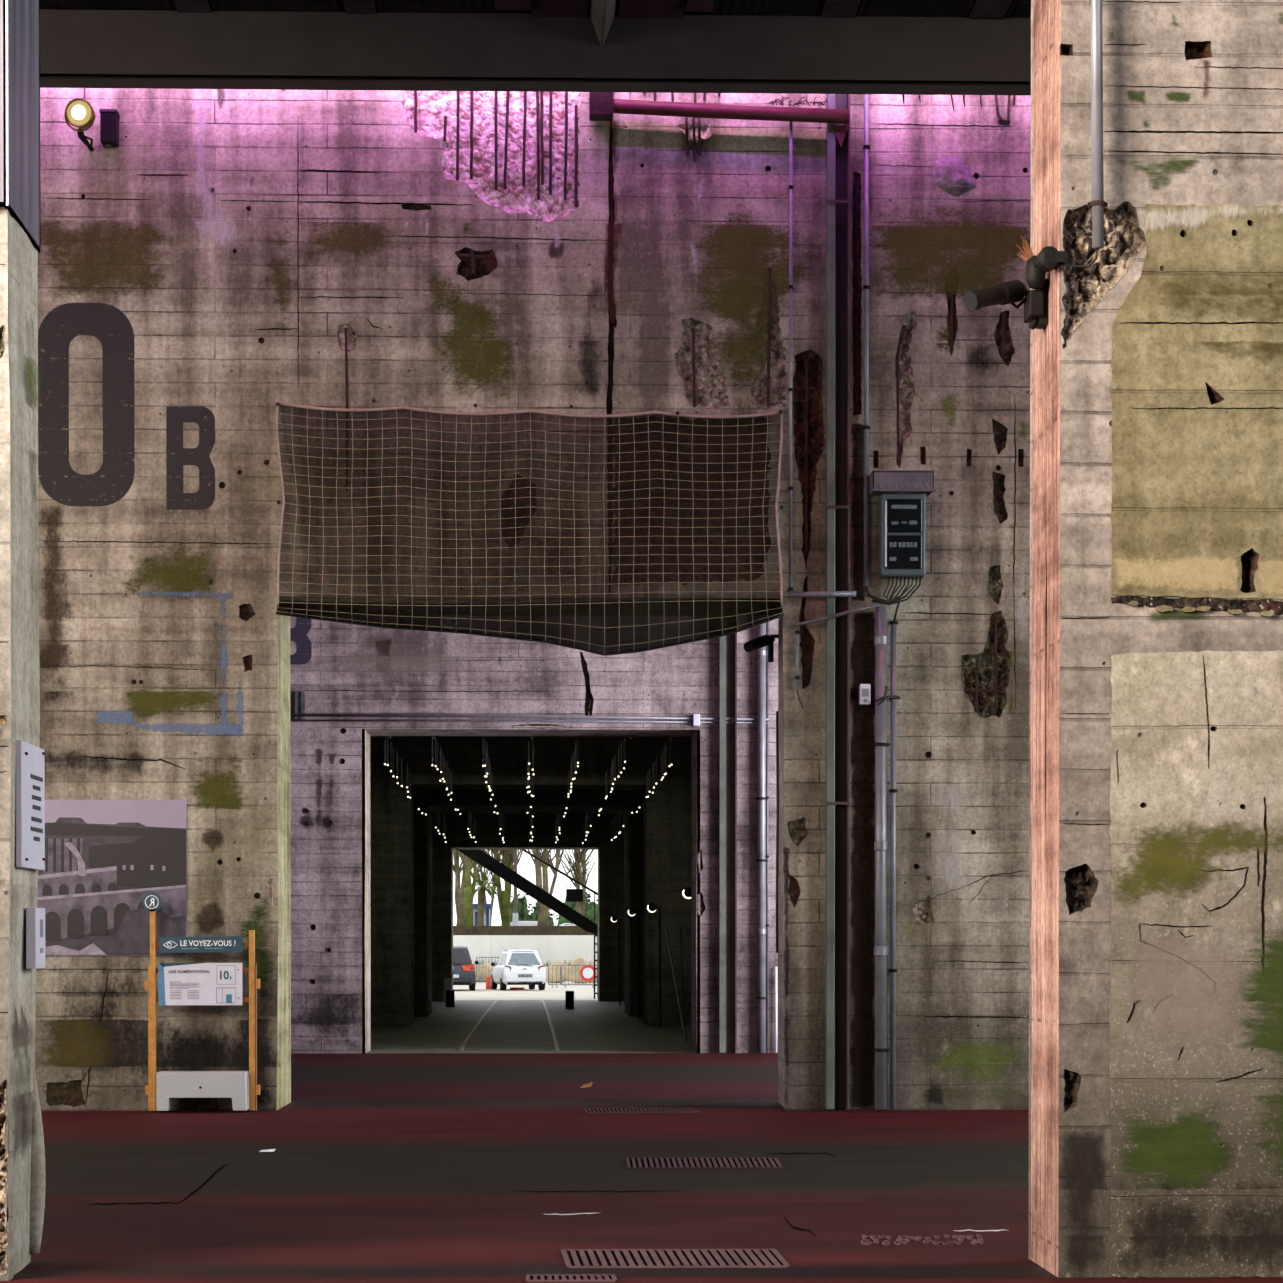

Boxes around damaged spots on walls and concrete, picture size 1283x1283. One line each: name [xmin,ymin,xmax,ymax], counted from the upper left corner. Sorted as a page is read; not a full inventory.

crack [219,125,472,387]
spalling [455,247,497,281]
spalling [402,91,582,222]
crack [383,130,615,253]
spalling [1059,201,1145,348]
crack [457,289,617,414]
spalling [674,267,825,689]
crack [302,659,540,692]
crack [559,652,594,716]
spalling [960,565,1012,718]
crack [1139,797,1267,994]
spalling [0,1079,13,1275]